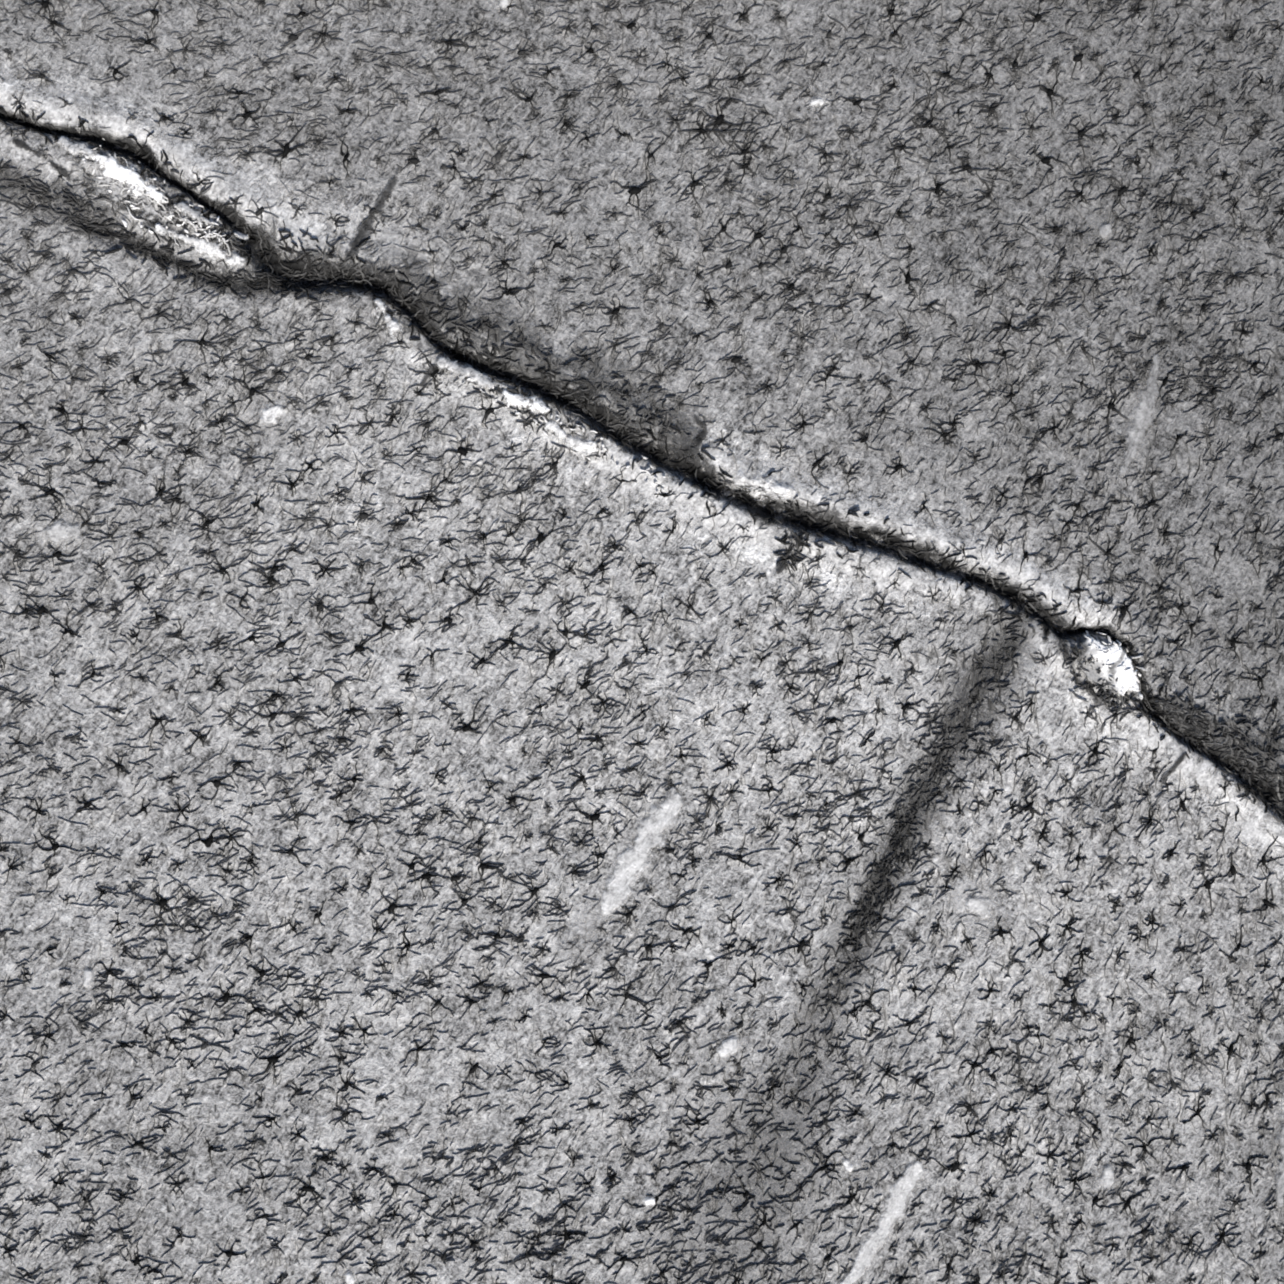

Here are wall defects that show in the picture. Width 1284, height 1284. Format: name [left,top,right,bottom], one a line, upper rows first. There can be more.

crack [0,73,1284,864]